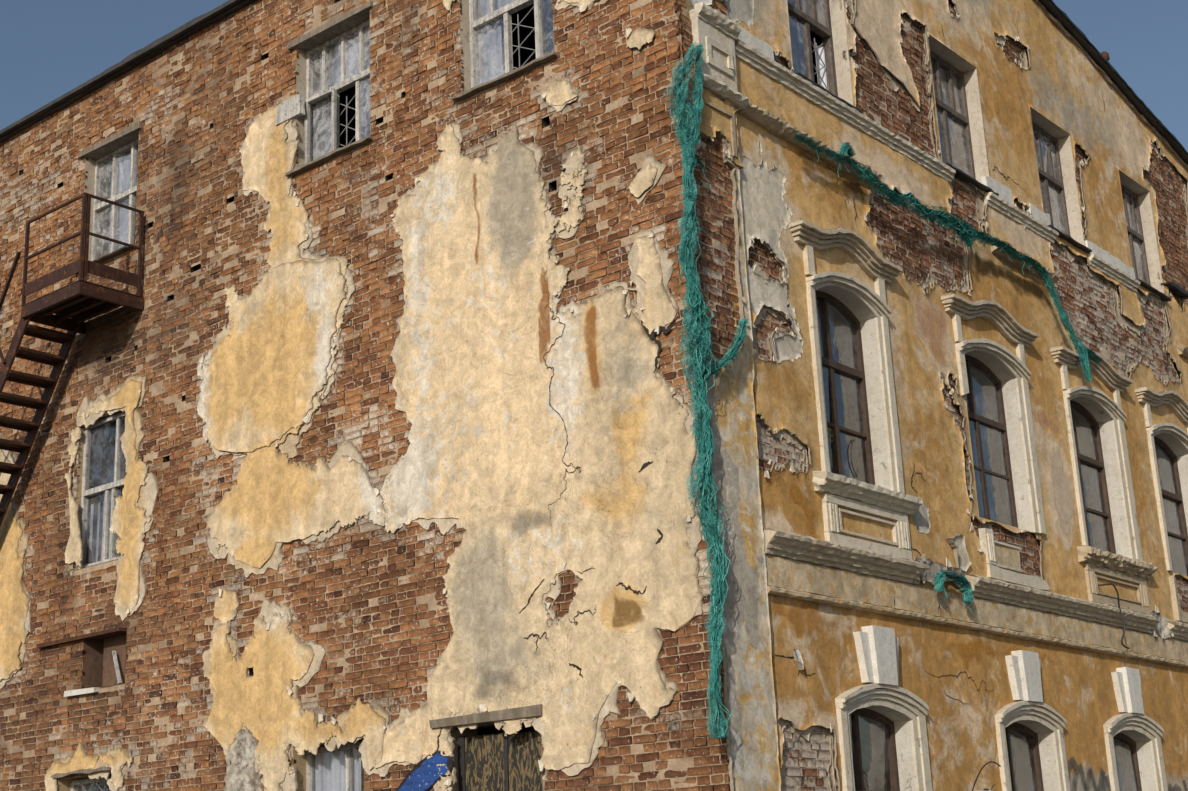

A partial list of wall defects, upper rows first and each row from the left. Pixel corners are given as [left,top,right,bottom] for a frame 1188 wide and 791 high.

spalling [839,0,941,159]
spalling [686,125,804,391]
spalling [864,178,989,296]
spalling [1050,142,1188,385]
flaking render [182,105,704,791]
spalling [753,381,810,479]
spalling [940,373,1041,578]
rust [36,627,127,648]
crack [519,579,596,651]
crack [577,567,647,594]
crack [927,671,994,704]
spalling [778,718,838,791]